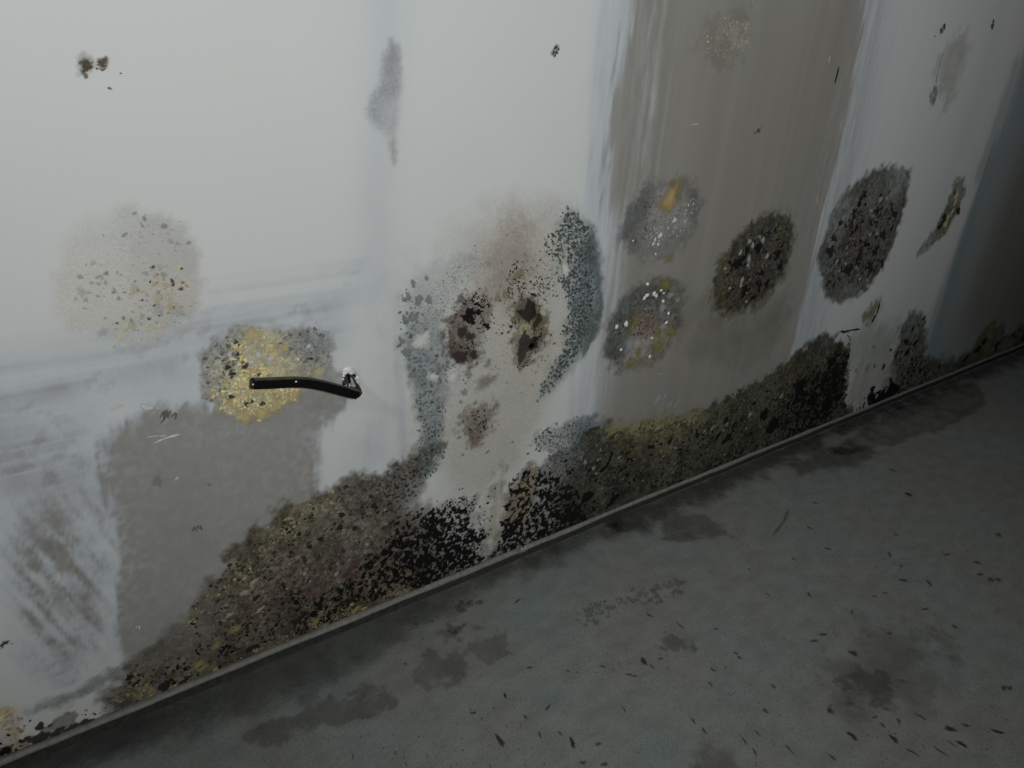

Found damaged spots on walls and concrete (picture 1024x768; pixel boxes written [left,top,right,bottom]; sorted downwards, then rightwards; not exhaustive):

water stain [621,180,699,261]
water stain [818,166,910,303]
water stain [0,205,1024,757]